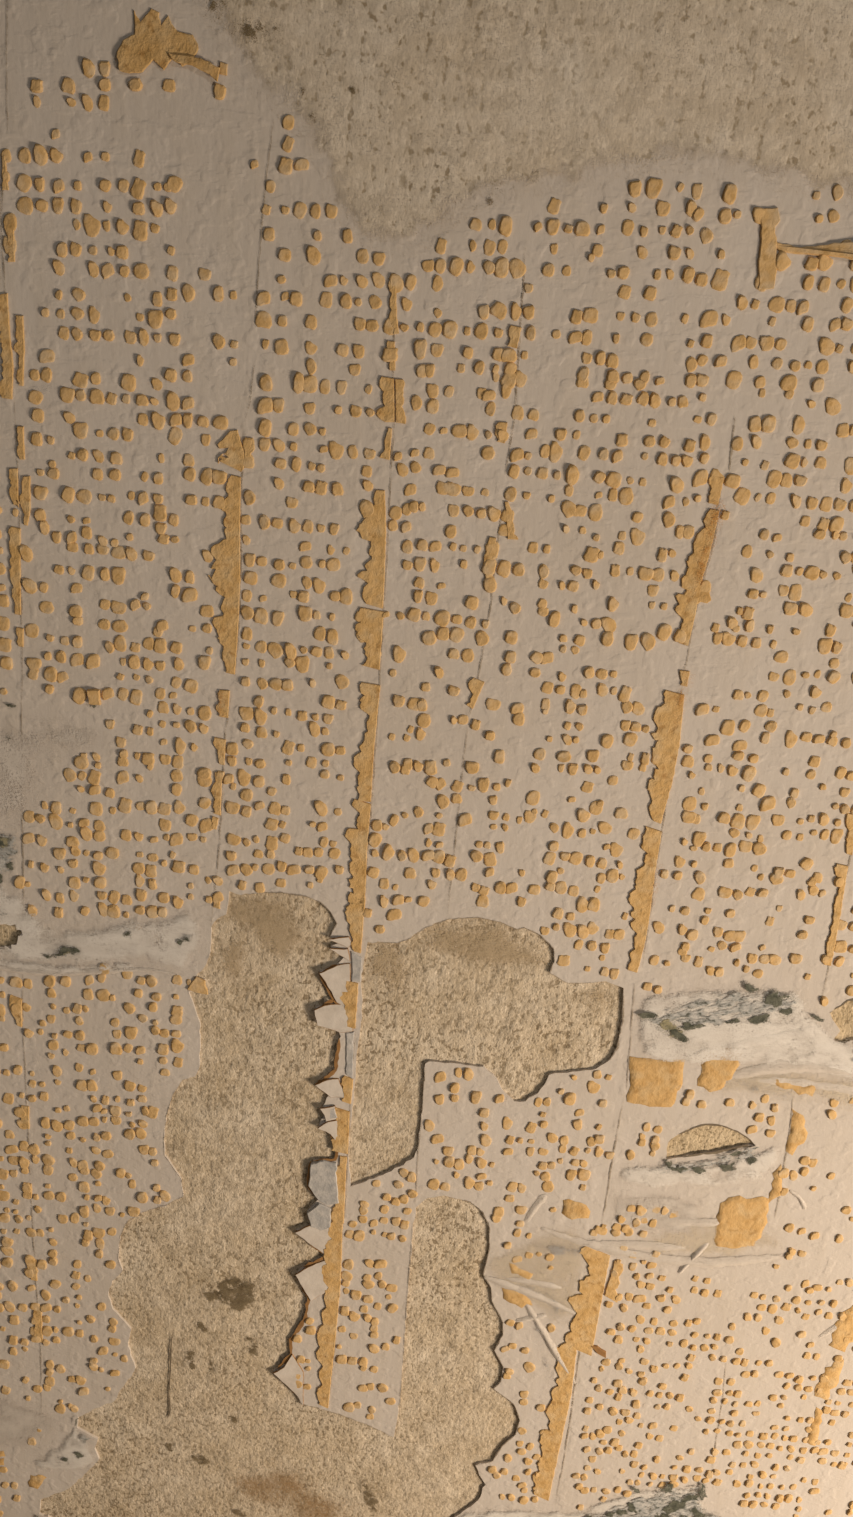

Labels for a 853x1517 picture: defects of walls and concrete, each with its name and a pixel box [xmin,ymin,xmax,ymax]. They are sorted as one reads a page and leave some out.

peeling [116,9,228,82]
peeling [758,207,853,290]
leakage [208,430,255,718]
leakage [675,475,724,646]
leakage [0,704,335,1001]
leakage [628,670,690,973]
leakage [824,813,853,966]
leakage [633,981,853,1101]
flaking render [830,999,853,1045]
flaking render [28,891,755,1517]
leakage [203,1276,257,1313]
leakage [459,1241,724,1517]